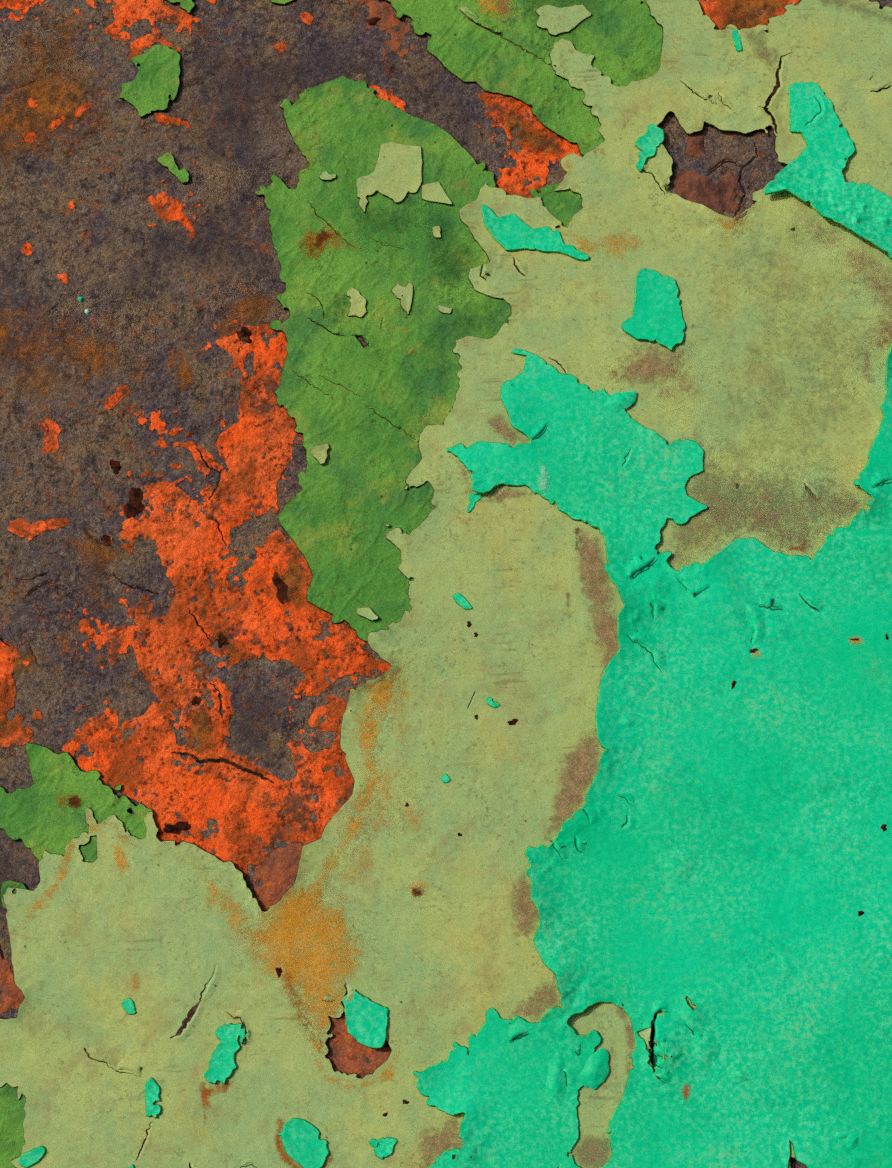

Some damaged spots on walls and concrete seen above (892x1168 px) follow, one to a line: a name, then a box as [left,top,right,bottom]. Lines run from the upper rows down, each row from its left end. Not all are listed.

corrosion [721,0,784,30]
peeling [634,84,892,260]
peeling [645,343,892,581]
corrosion [123,487,144,518]
peeling [0,0,813,1002]
corrosion [271,545,309,605]
corrosion [163,821,191,835]
corrosion [0,954,24,1014]
corrosion [253,842,393,1088]
peeling [341,990,389,1064]
peeling [413,987,711,1168]
peeling [278,1118,329,1168]